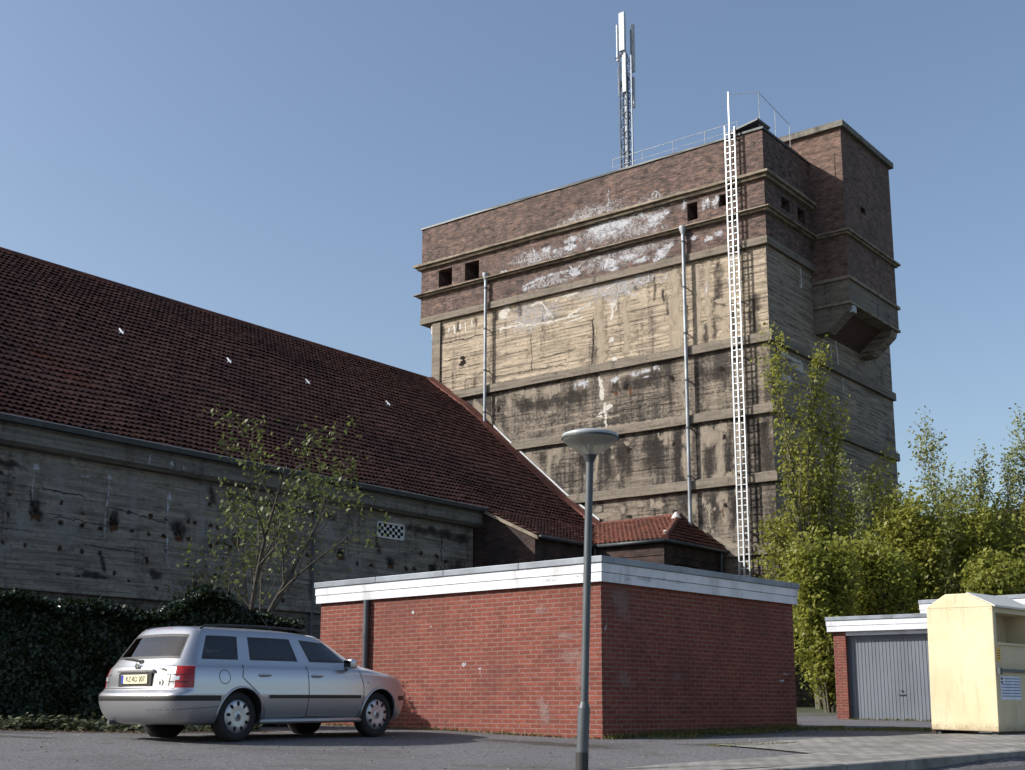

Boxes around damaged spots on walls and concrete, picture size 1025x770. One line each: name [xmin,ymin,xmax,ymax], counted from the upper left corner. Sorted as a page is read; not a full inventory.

damp [703,256,735,343]
damp [749,294,760,334]
damp [517,365,661,428]
damp [678,363,693,416]
damp [604,437,659,477]
damp [674,431,684,482]
damp [704,446,715,478]
damp [755,419,773,472]
spalling [29,500,42,521]
spalling [109,511,119,531]
spalling [172,522,185,541]
damp [731,499,741,529]